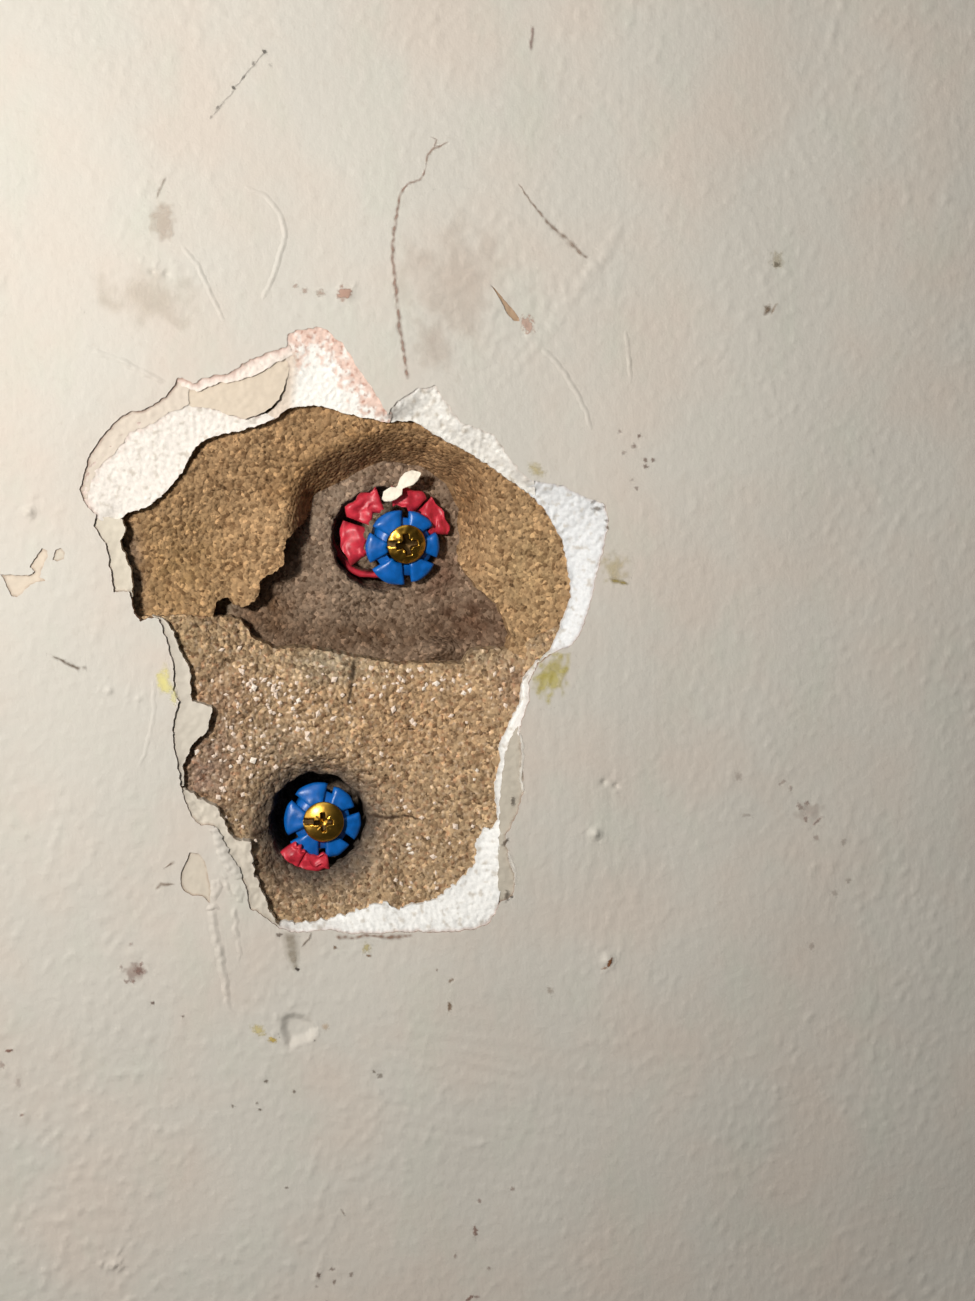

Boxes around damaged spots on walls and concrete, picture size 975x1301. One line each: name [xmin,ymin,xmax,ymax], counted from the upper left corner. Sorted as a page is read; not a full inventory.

peeling [2,548,65,597]
flaking render [80,327,609,934]